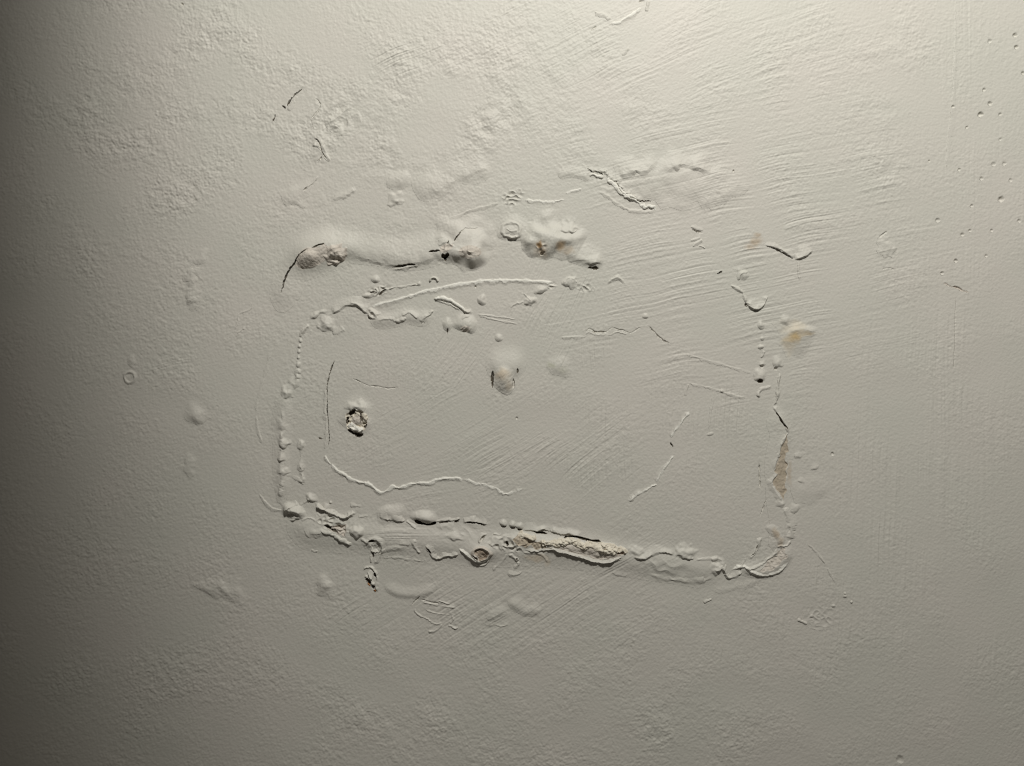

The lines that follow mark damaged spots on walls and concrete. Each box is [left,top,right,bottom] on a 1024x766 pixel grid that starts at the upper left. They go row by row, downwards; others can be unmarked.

crack [319,363,398,448]
peeling [276,269,793,592]